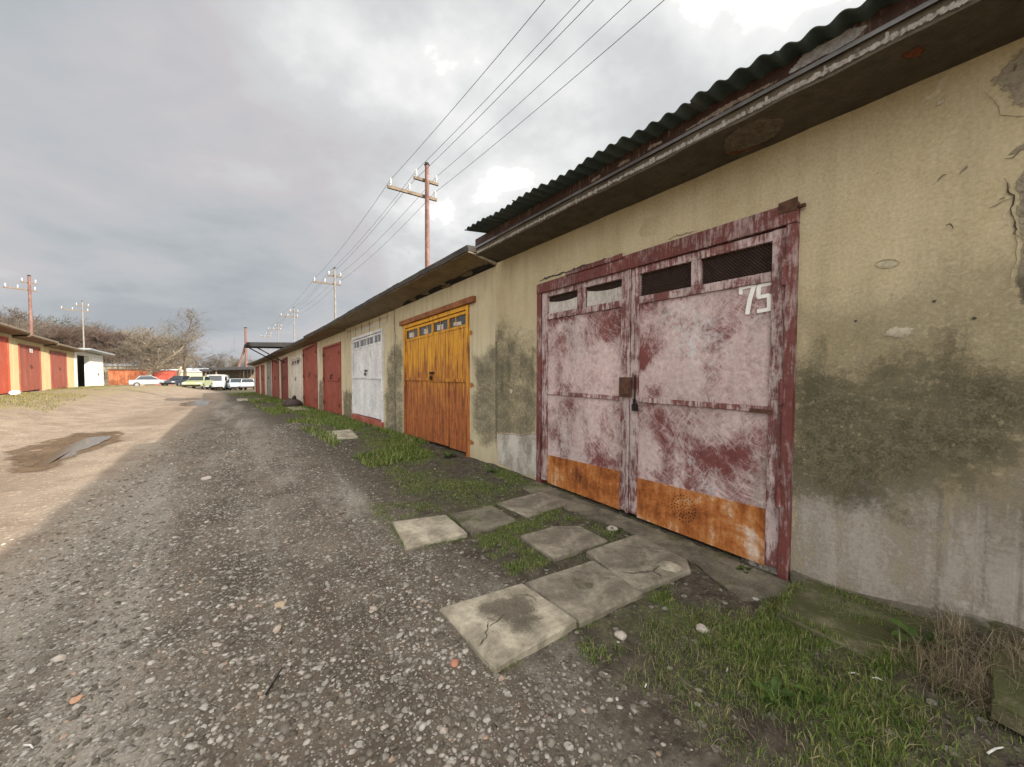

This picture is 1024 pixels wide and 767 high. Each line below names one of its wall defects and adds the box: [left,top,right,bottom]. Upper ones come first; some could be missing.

spalling [986,49,1024,117]
spalling [1000,171,1024,304]
water stain [385,346,403,432]
water stain [474,329,537,445]
water stain [791,348,1024,629]